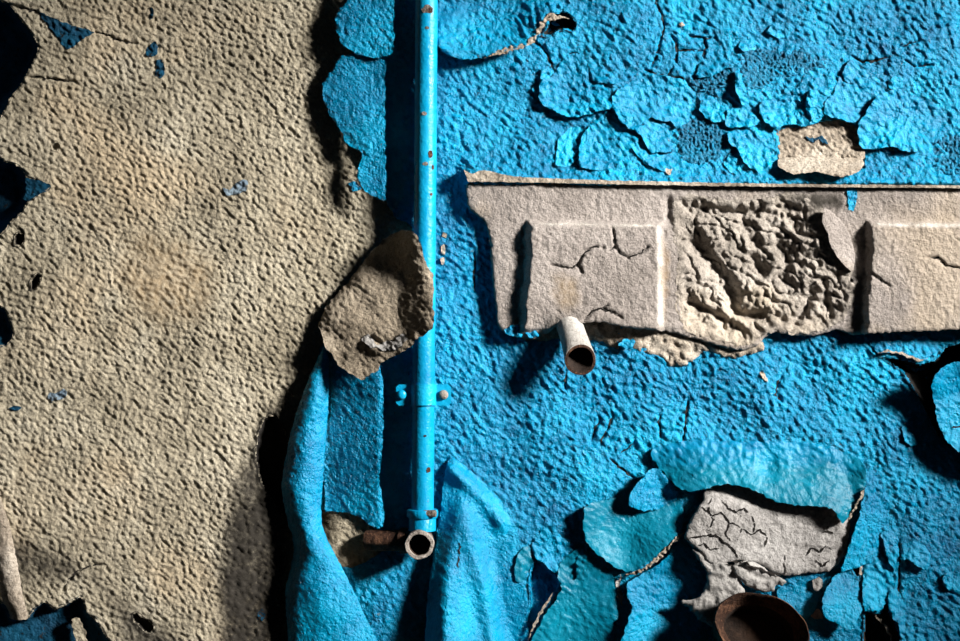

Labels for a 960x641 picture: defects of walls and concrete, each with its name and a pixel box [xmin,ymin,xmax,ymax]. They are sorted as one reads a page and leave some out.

peeling [421,0,569,60]
peeling [739,39,761,51]
peeling [322,0,395,201]
peeling [532,53,953,177]
peeling [23,178,51,200]
spalling [13,231,25,247]
spalling [29,273,42,291]
crack [557,229,644,272]
spalling [671,191,857,347]
peeling [321,352,384,568]
flaking render [514,439,931,641]
spalling [131,611,155,634]